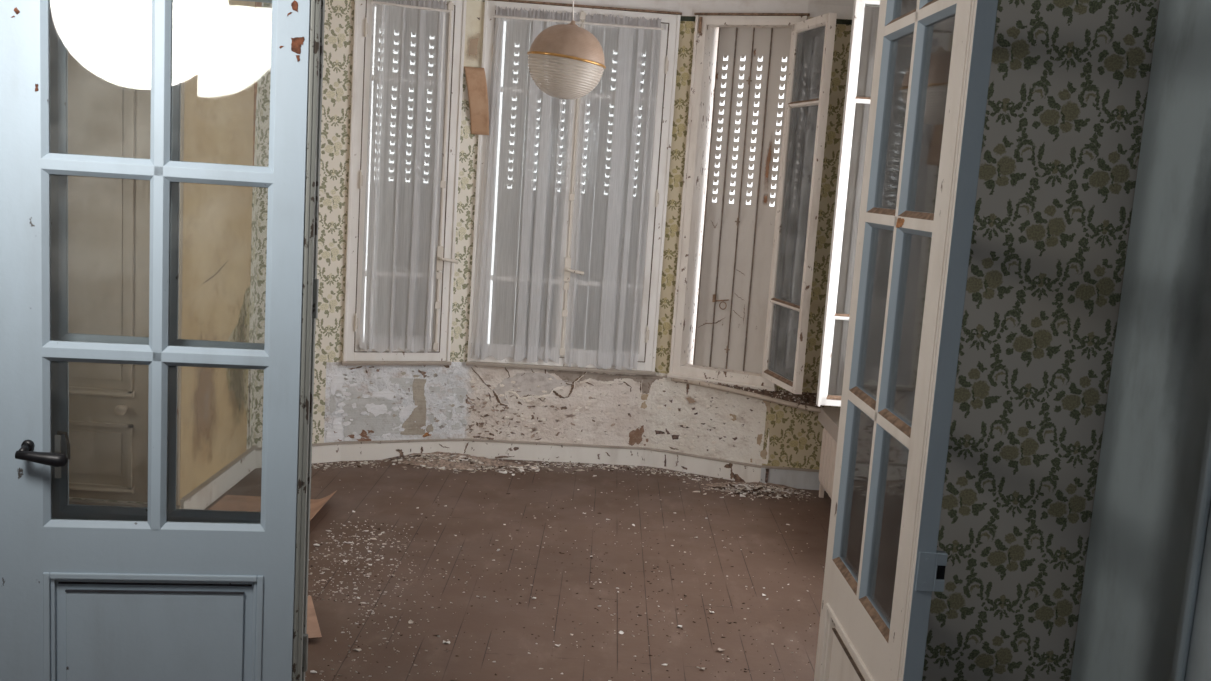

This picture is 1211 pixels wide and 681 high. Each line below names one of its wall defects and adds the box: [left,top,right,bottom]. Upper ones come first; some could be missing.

peeling [326,365,771,464]